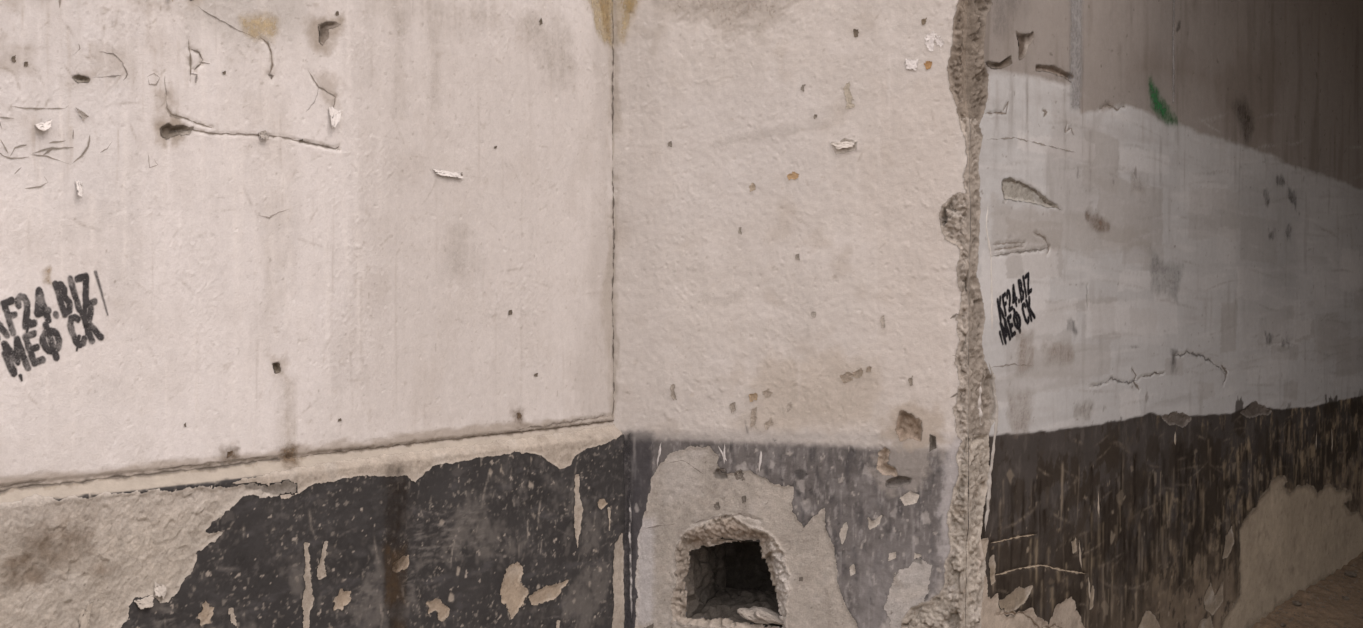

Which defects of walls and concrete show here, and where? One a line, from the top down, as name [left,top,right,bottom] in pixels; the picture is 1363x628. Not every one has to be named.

crack [199,7,274,79]
crack [609,0,617,134]
damp [591,0,636,41]
crack [0,171,615,493]
spalling [877,0,1095,628]
crack [1089,351,1227,390]
peeling [0,424,622,628]
peeling [612,446,858,628]
peeling [868,515,882,530]
peeling [1138,610,1161,628]
peeling [1198,476,1363,628]